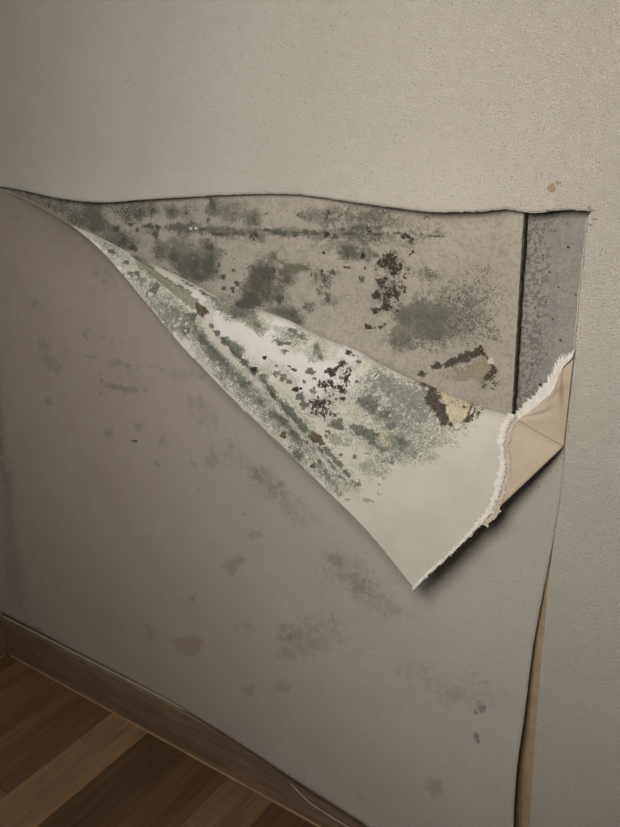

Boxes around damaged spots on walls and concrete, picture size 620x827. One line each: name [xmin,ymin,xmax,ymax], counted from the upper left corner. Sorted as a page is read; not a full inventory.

damp [13,190,508,503]
peeling [417,345,499,429]